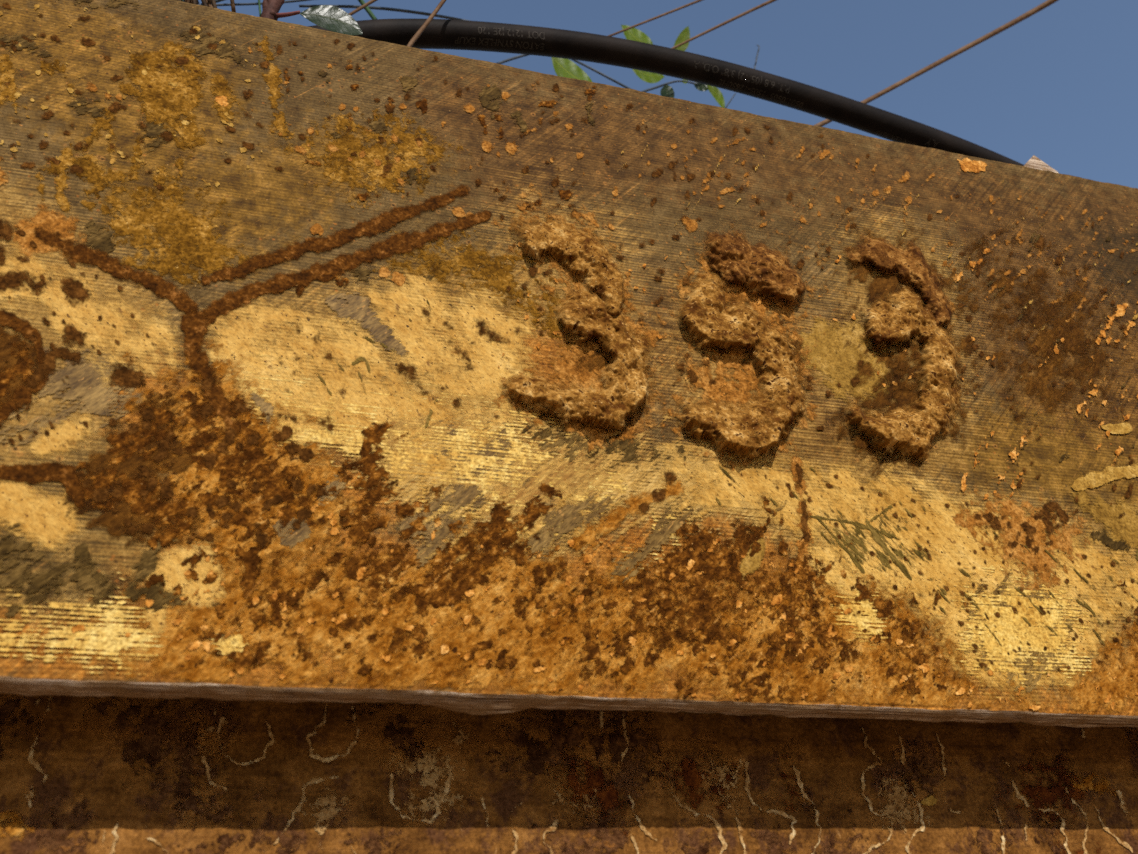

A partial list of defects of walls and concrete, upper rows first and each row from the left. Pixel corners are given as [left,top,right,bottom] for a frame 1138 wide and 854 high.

corrosion [0,33,61,54]
corrosion [0,82,84,176]
corrosion [67,75,127,113]
corrosion [129,35,198,88]
corrosion [138,120,189,142]
corrosion [189,25,226,50]
corrosion [216,41,314,168]
corrosion [327,76,436,198]
corrosion [444,79,478,116]
corrosion [469,111,588,187]
corrosion [422,127,1137,476]
corrosion [63,316,1138,713]